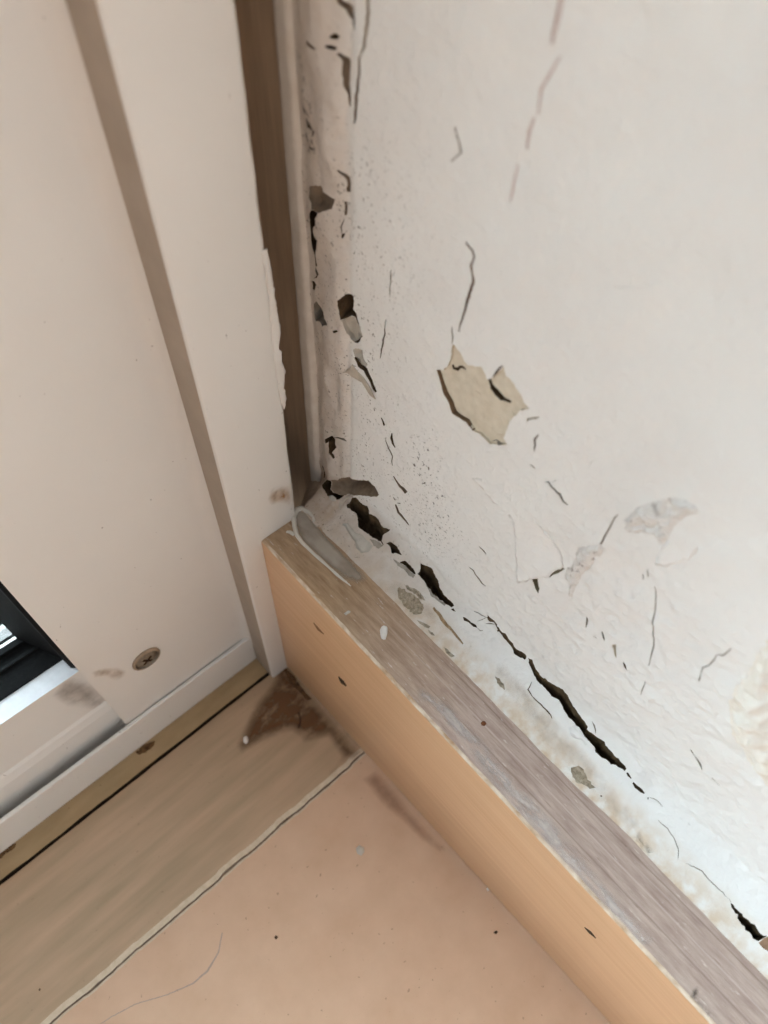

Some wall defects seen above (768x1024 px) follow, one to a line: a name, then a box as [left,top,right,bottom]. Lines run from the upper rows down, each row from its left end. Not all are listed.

crack [451,127,462,162]
crack [510,0,564,202]
flaking render [309,185,377,399]
crack [451,242,475,344]
peeling [437,345,529,445]
flaking render [322,466,379,509]
crack [381,418,409,525]
crack [600,515,618,544]
flaking render [624,497,700,545]
crack [586,569,656,693]
leakage [243,670,351,755]
crack [474,611,768,951]